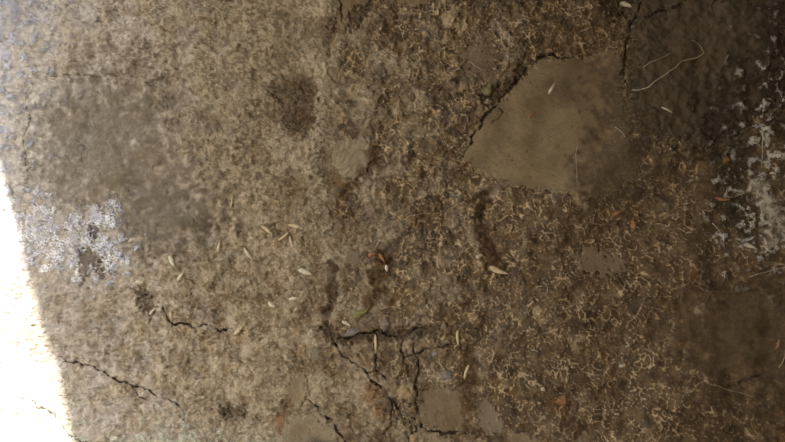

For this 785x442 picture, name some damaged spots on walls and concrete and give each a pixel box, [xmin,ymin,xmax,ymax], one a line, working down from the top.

spalling [348,5,369,33]
spalling [480,67,526,108]
water stain [685,0,785,251]
water stain [0,70,212,297]
spalling [327,328,437,354]
crack [64,359,185,413]
crack [325,323,467,442]
crack [20,397,92,442]
crack [308,399,346,442]